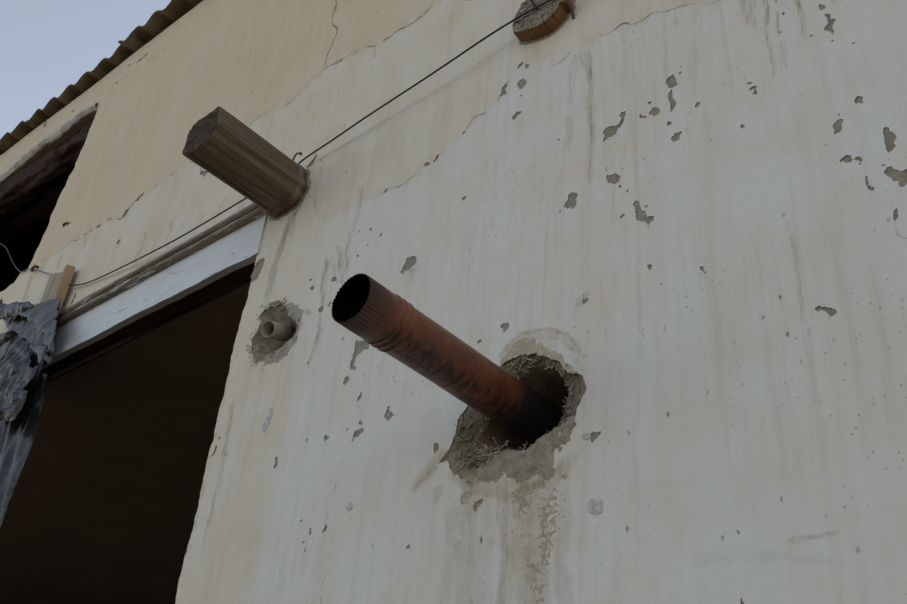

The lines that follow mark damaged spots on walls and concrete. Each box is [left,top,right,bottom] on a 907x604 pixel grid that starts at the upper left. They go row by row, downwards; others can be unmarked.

peeling [819,5,835,42]
crack [317,1,432,77]
peeling [603,112,626,141]
peeling [883,128,897,153]
peeling [606,170,628,193]
peeling [882,165,907,187]
peeling [560,192,578,212]
peeling [634,201,654,225]
peeling [401,256,417,274]
spalling [246,297,303,368]
spalling [434,338,586,604]